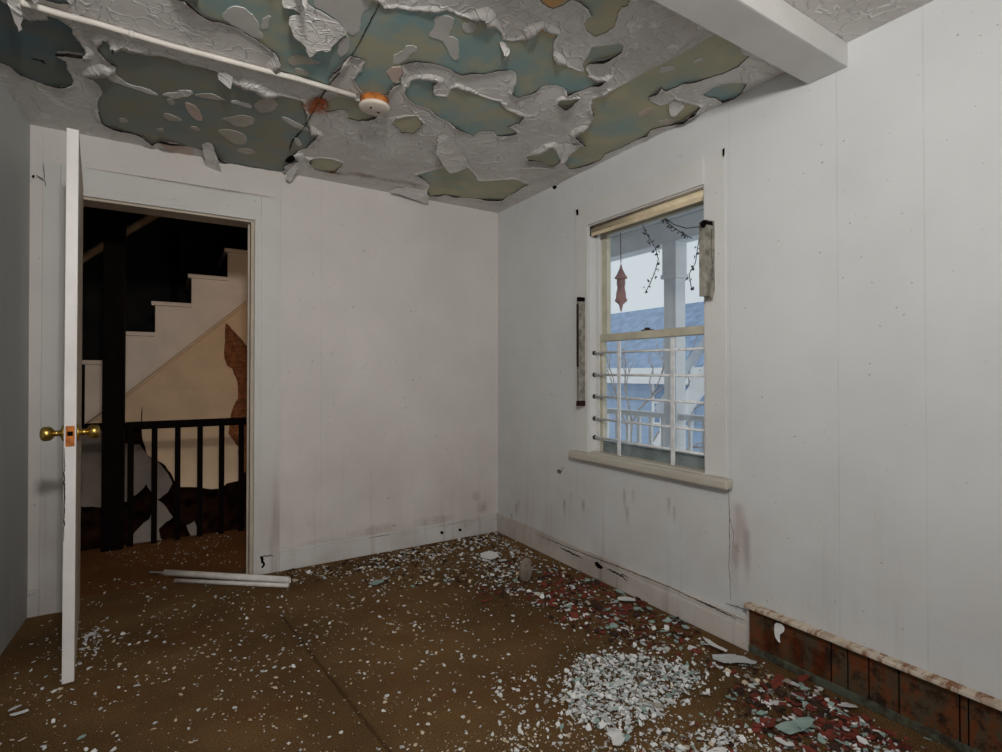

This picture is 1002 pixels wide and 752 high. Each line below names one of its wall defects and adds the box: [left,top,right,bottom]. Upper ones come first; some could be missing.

peeling [0,0,344,182]
peeling [179,0,753,204]
spalling [81,416,102,507]
spalling [125,304,247,544]
corrosion [765,629,778,649]